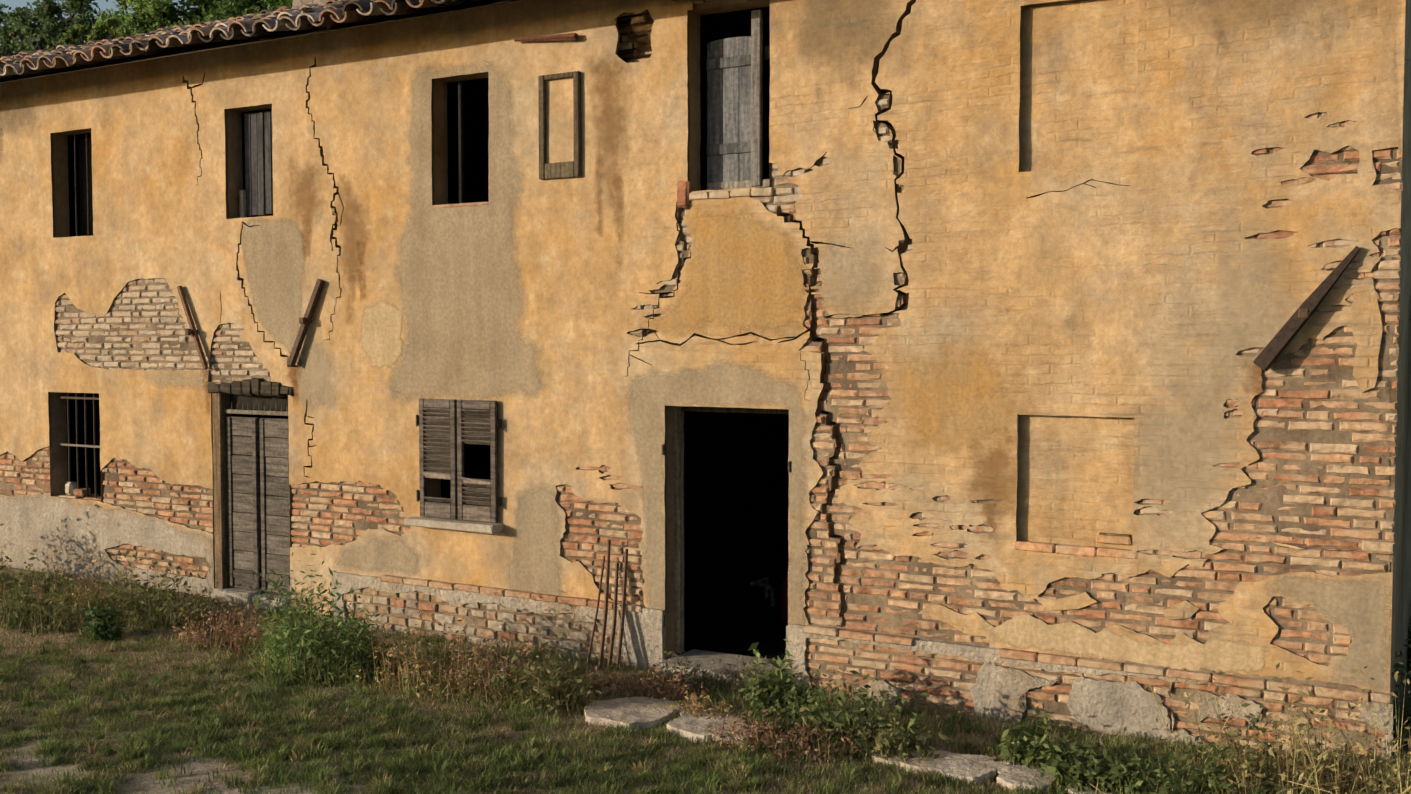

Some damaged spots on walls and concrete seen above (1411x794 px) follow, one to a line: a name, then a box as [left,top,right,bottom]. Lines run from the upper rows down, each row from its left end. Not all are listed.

crack [183,75,205,180]
crack [306,58,344,340]
crack [848,0,916,316]
flaking render [1263,139,1404,209]
flaking render [55,278,271,383]
flaking render [0,435,53,496]
flaking render [102,458,213,533]
flaking render [291,481,411,548]
flaking render [557,465,645,604]
crack [627,206,850,626]
flaking render [800,226,1402,759]
flaking render [331,587,617,662]